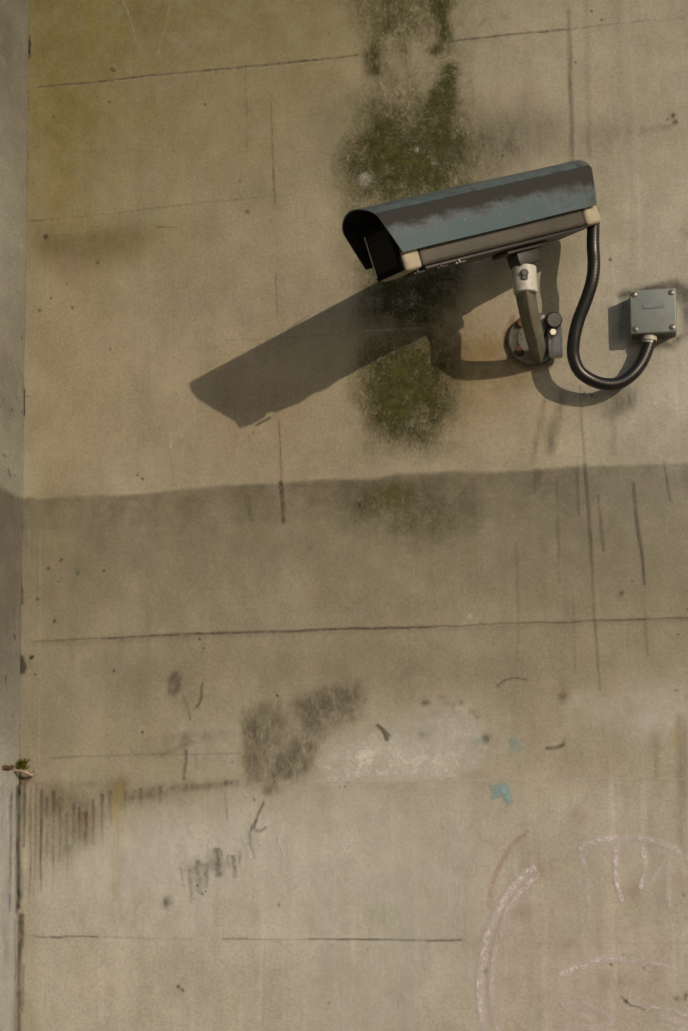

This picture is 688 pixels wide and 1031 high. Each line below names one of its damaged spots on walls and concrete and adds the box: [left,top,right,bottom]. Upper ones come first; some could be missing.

water stain [377,0,451,53]